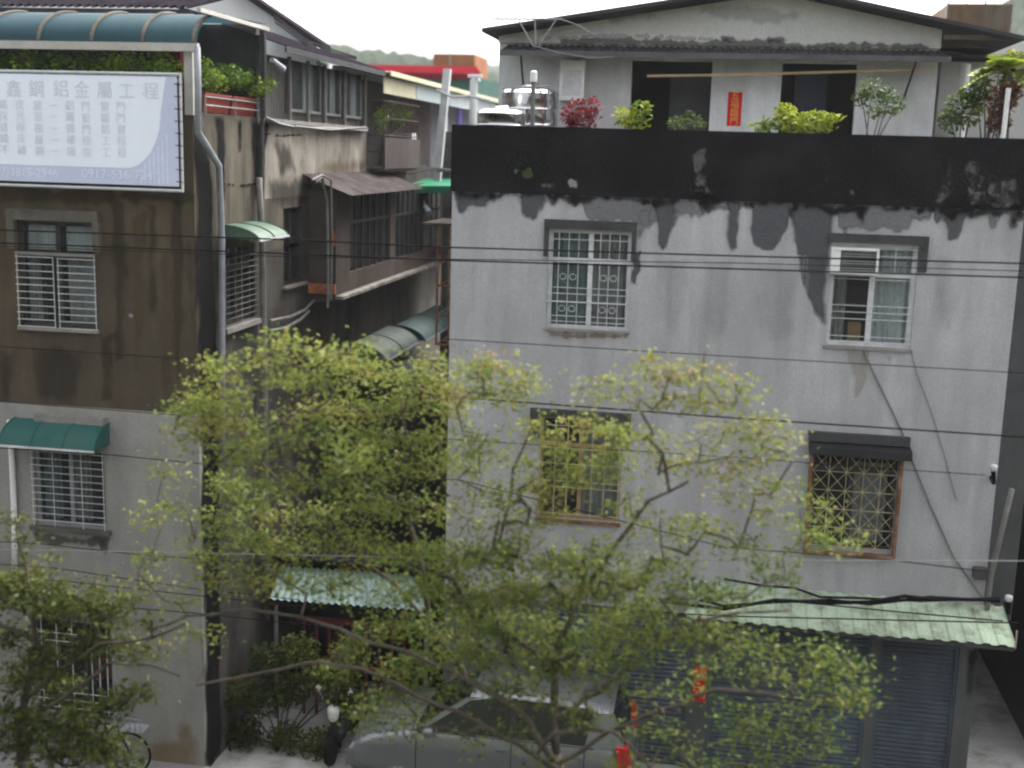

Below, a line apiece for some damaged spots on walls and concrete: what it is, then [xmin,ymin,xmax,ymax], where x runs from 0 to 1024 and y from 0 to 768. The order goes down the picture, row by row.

damp [239,120,311,203]
peeling [693,149,709,193]
peeling [966,163,1016,208]
damp [521,194,1023,322]